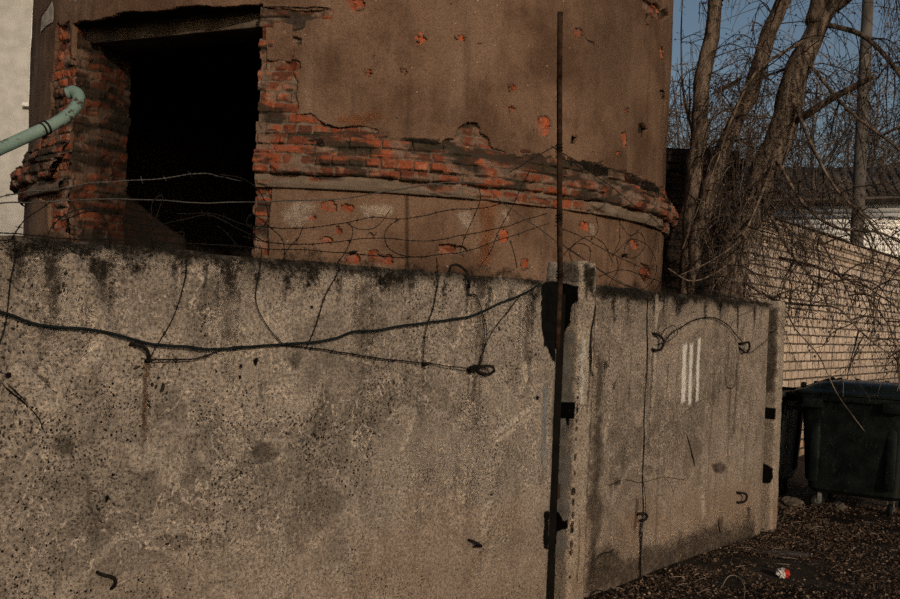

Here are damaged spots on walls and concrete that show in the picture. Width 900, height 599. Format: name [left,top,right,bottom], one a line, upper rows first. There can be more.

flaking render [40,2,77,118]
flaking render [256,7,383,146]
flaking render [37,120,74,234]
flaking render [441,121,495,152]
leakage [6,234,549,313]
rust [142,362,151,438]